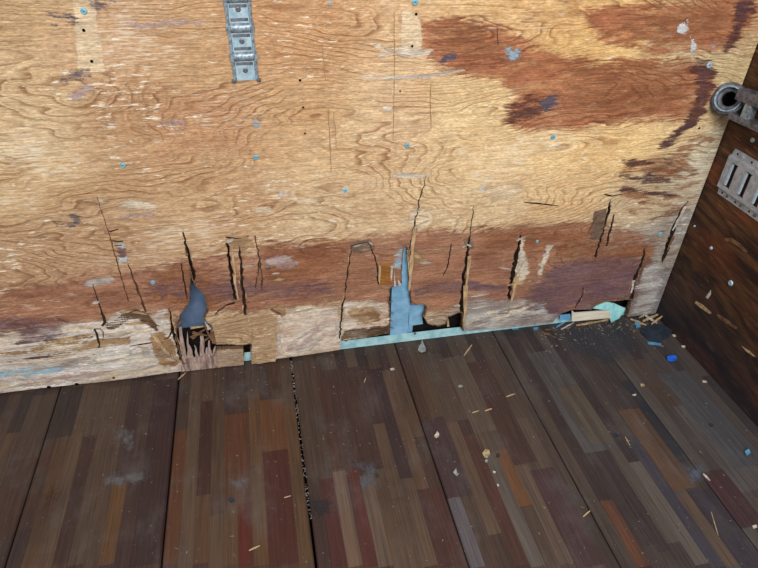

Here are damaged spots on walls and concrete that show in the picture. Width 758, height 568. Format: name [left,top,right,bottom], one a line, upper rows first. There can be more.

leakage [421,0,758,212]
spalling [107,271,252,372]
crack [181,229,196,299]
crack [215,235,263,315]
leakage [0,222,664,336]
crack [339,242,379,339]
spalling [363,245,464,333]
crack [443,207,474,328]
crack [507,232,525,303]
crack [593,194,622,259]
hole [590,298,633,317]
crack [629,201,689,301]